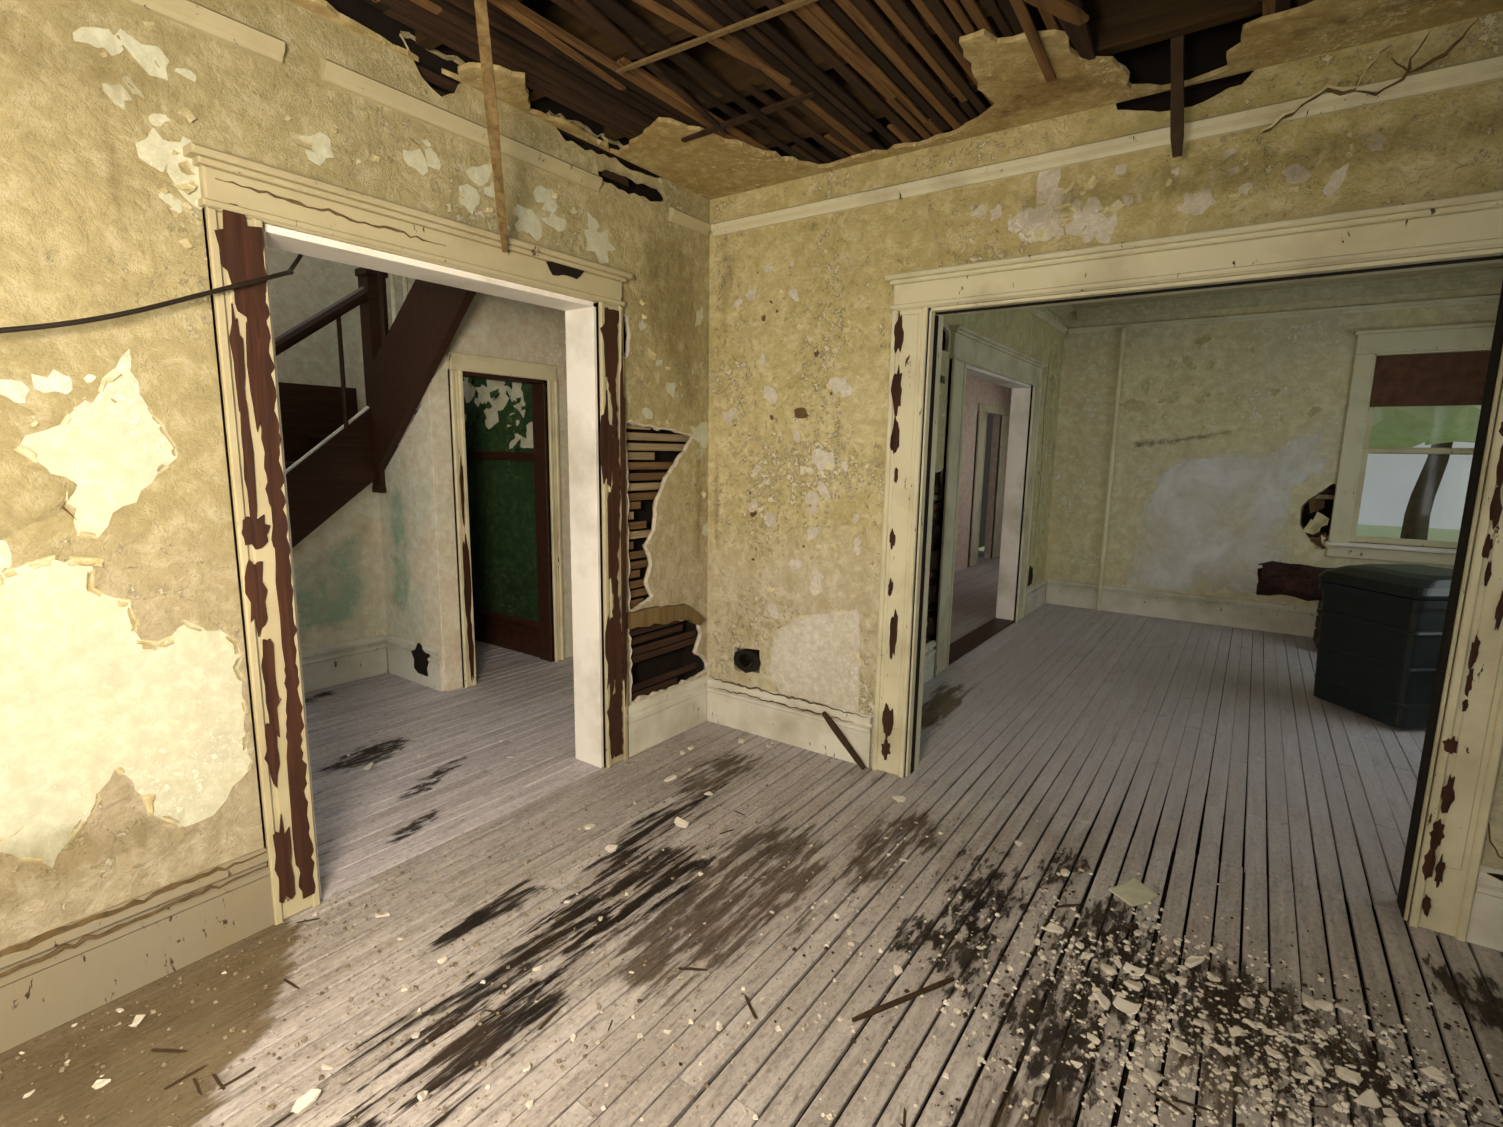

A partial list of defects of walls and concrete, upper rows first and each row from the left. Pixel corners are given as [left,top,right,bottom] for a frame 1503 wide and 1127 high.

spalling [362,0,1060,215]
crack [1256,18,1479,141]
peeling [0,21,316,903]
peeling [599,297,738,759]
peeling [748,303,868,712]
peeling [890,311,904,483]
peeling [1482,421,1503,630]
peeling [888,578,898,660]
peeling [881,703,894,760]
crack [0,851,268,978]
peeling [1422,775,1455,917]
crack [1487,821,1503,882]